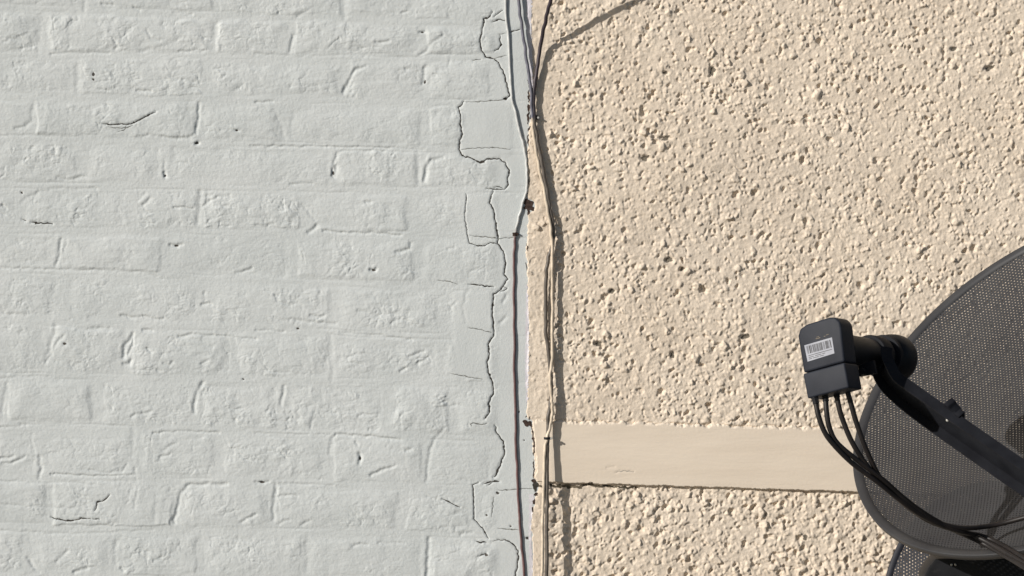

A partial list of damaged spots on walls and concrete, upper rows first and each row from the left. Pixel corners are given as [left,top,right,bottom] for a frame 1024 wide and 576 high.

peeling [526,0,534,155]
crack [107,112,155,132]
spalling [523,198,534,215]
peeling [518,284,539,576]
crack [52,496,109,522]